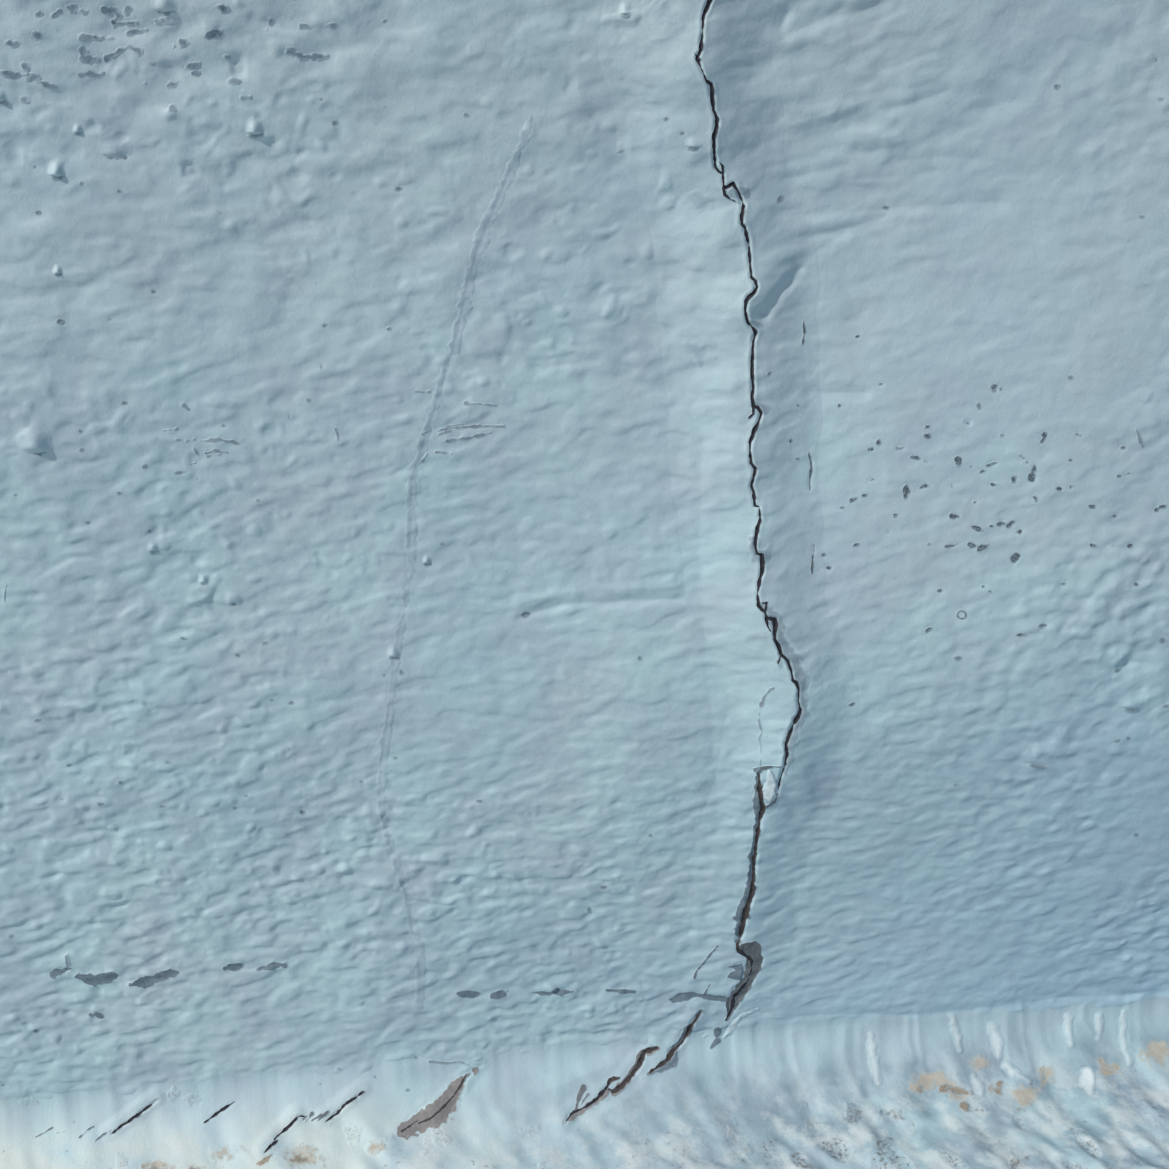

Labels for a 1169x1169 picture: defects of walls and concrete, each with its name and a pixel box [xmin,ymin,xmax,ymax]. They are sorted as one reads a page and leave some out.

crack [806,450,814,492]
crack [563,0,810,1126]
peeling [49,953,180,989]
peeling [221,960,288,973]
peeling [454,989,510,1000]
peeling [529,987,575,998]
peeling [605,987,637,995]
rust [1135,1037,1169,1072]
rust [906,1053,1058,1114]
crack [34,1098,159,1143]
crack [202,1100,237,1124]
crack [256,1090,366,1166]